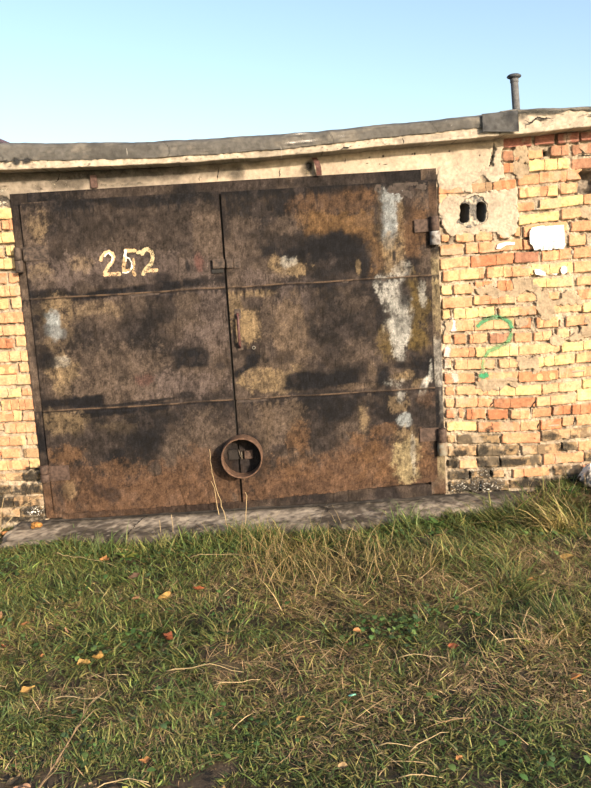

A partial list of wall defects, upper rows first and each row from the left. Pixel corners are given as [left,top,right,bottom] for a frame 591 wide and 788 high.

leakage [0,467,46,524]
leakage [448,445,580,494]